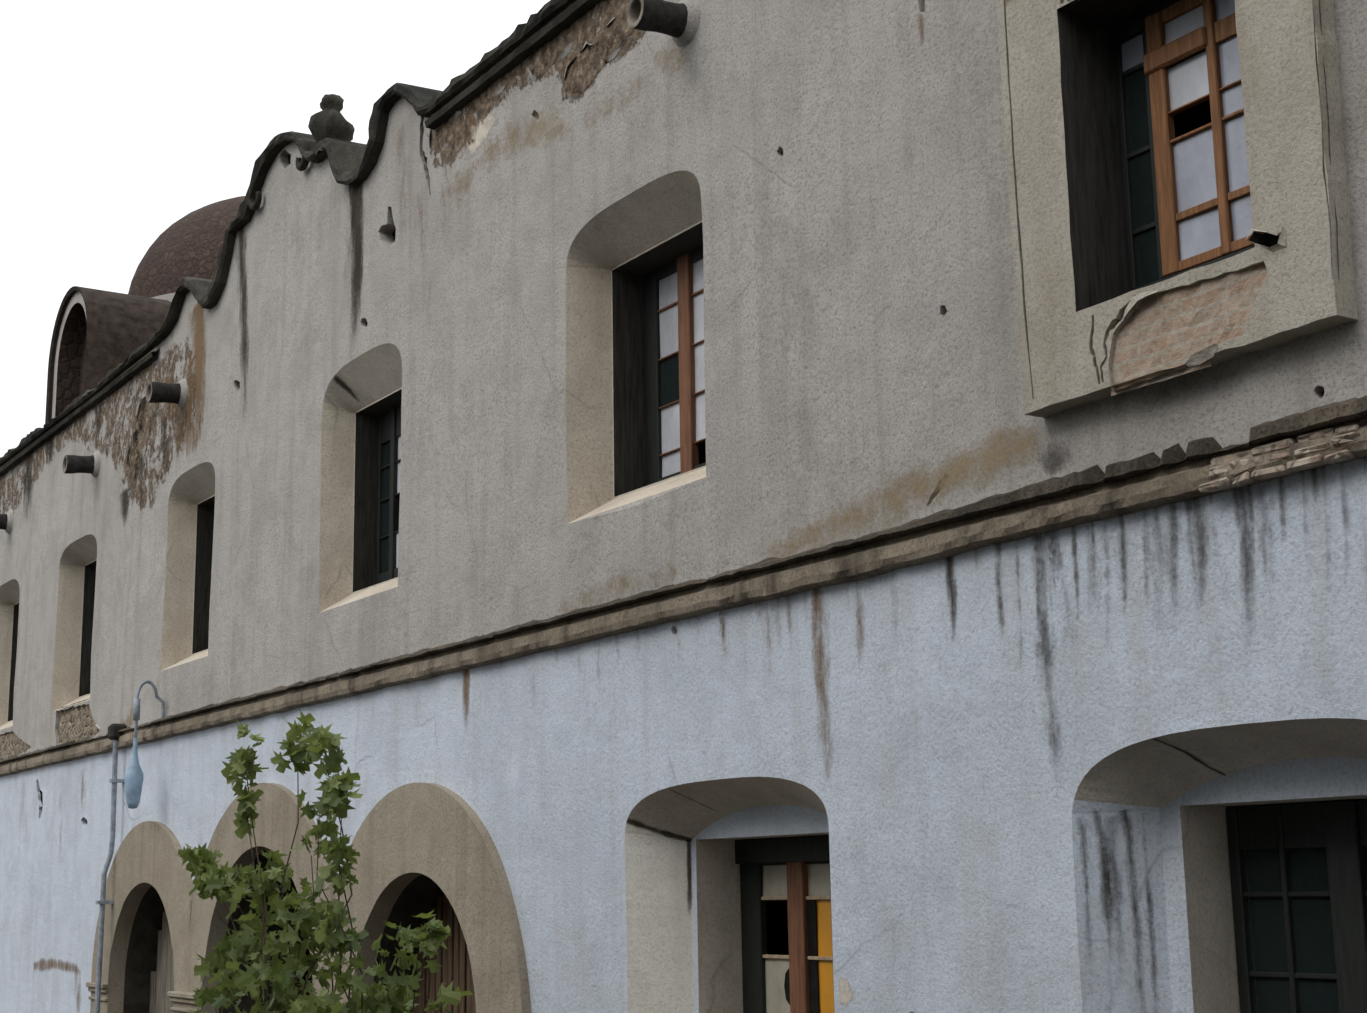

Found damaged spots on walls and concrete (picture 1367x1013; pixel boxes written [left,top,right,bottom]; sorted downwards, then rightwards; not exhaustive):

peeling [0,336,196,514]